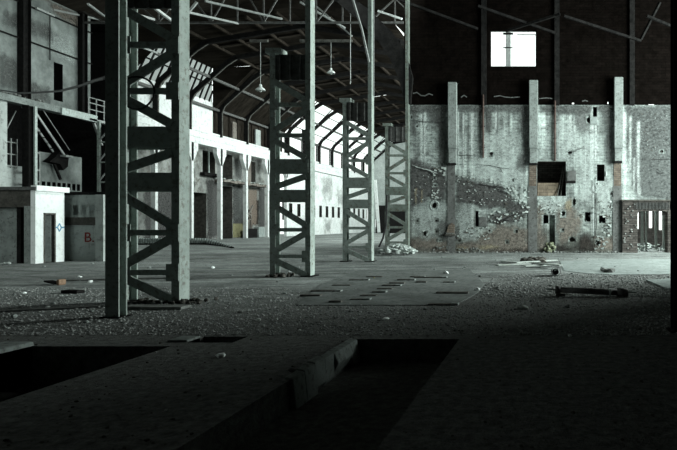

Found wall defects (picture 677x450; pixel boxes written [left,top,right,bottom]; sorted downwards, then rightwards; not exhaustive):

peeling [411,167,446,208]
damp [458,106,497,181]
flaking render [433,165,566,251]
spalling [571,194,613,249]
damp [623,106,670,200]